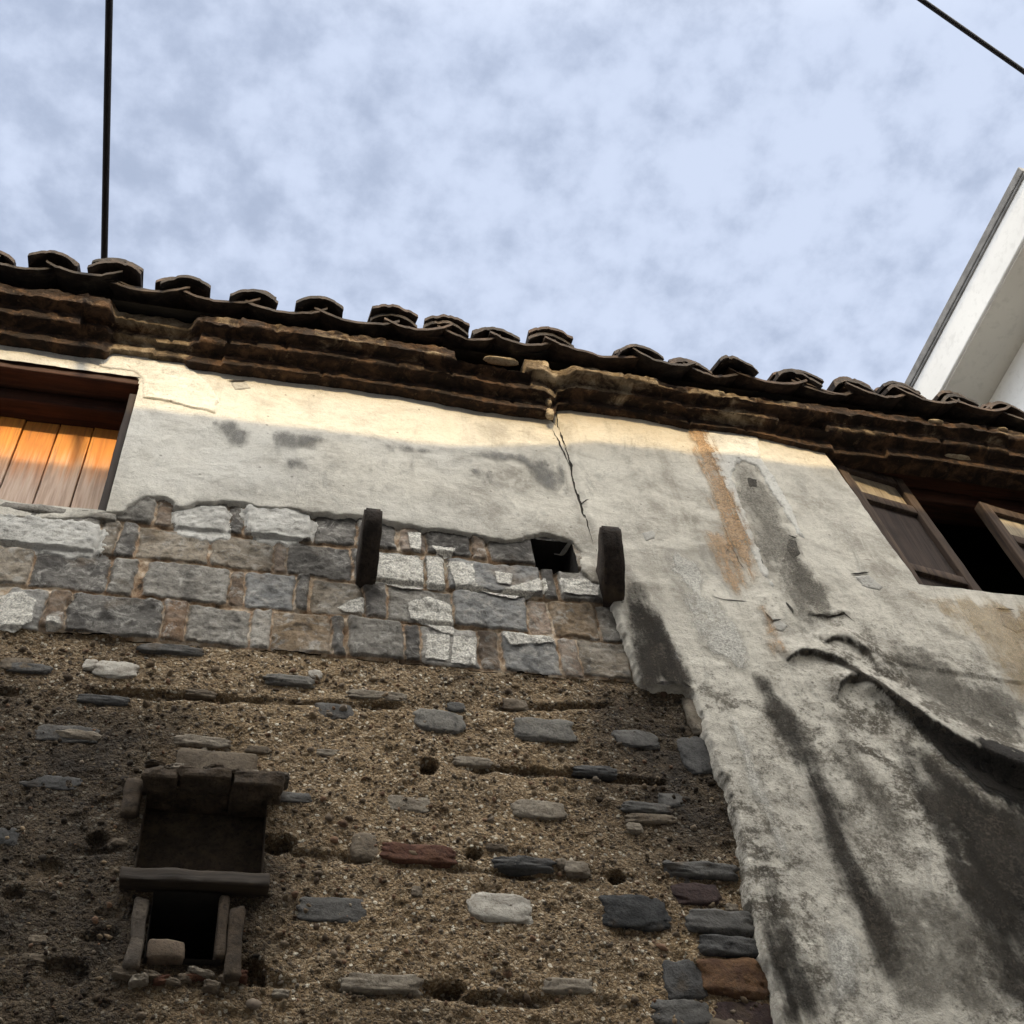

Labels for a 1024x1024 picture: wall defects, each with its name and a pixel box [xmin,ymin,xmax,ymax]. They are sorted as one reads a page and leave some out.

flaking render [0,497,635,684]
crack [552,411,597,551]
water stain [628,582,691,686]
rust [689,429,755,591]
water stain [737,470,830,623]
water stain [753,636,1024,1016]